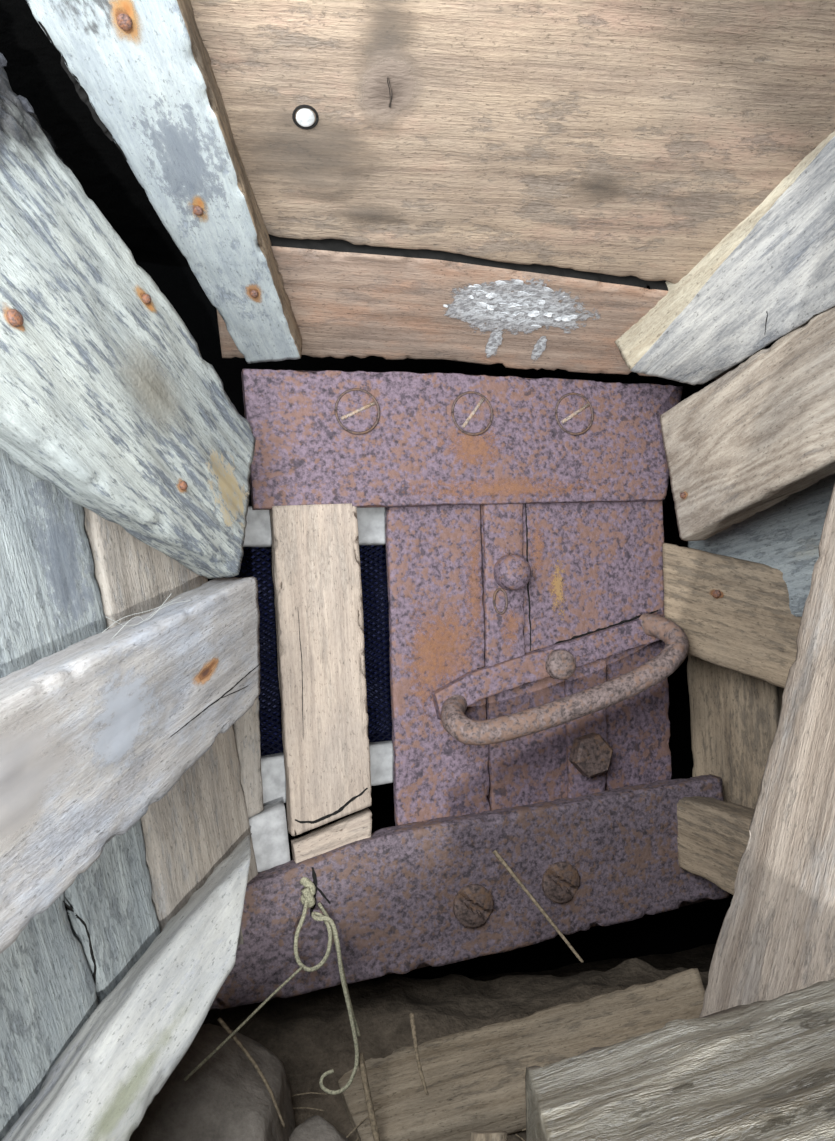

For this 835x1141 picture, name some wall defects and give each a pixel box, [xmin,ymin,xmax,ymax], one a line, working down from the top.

rust [109,0,138,40]
rust [190,197,207,220]
rust [136,287,155,311]
rust [246,285,261,302]
rust [548,557,565,620]
rust [195,658,218,684]